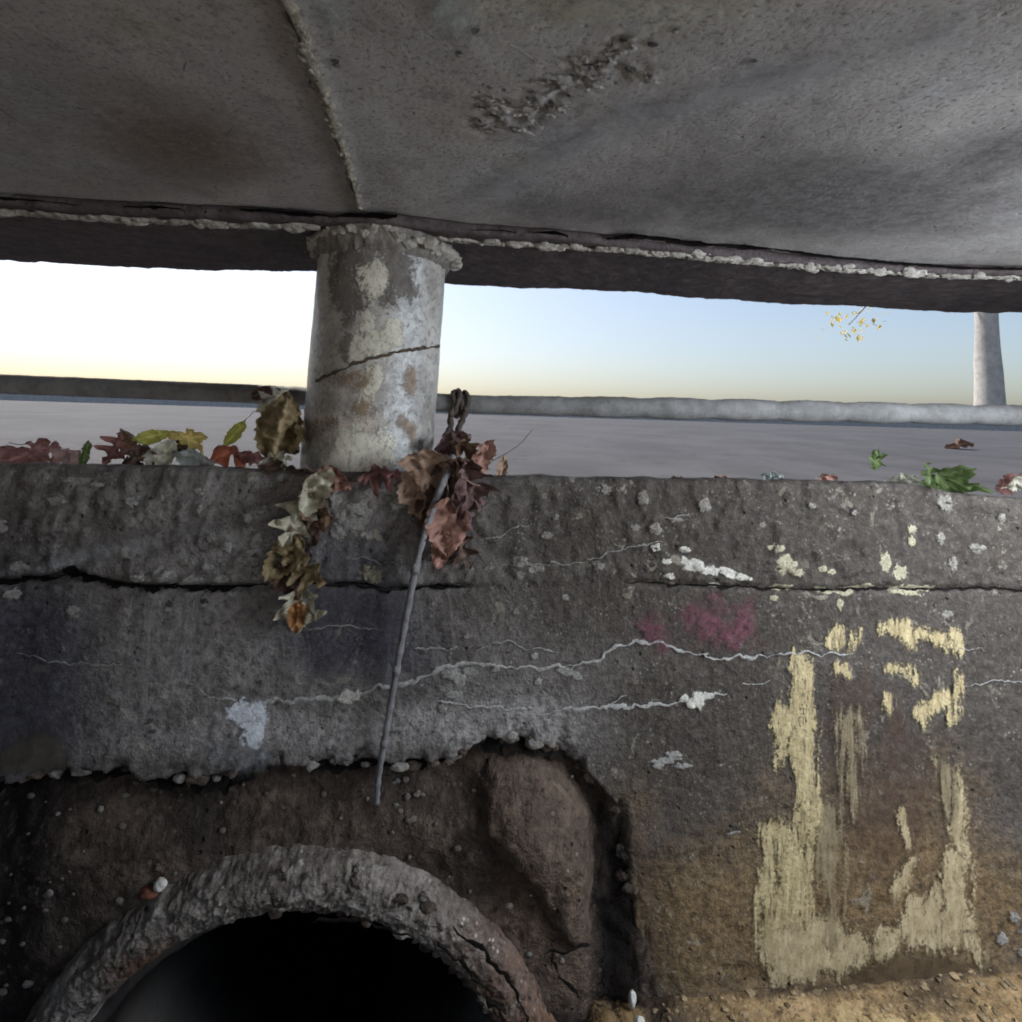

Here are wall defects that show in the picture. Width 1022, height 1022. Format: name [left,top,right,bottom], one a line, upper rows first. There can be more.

spalling [475,36,659,136]
crack [240,0,397,220]
crack [607,233,1022,270]
crack [315,344,440,383]
crack [626,581,1022,592]
crack [19,639,853,715]
spalling [306,750,371,773]
crack [314,736,566,775]
spalling [499,731,561,752]
spalling [386,748,468,824]
spalling [393,890,437,915]
damp [585,802,648,1022]